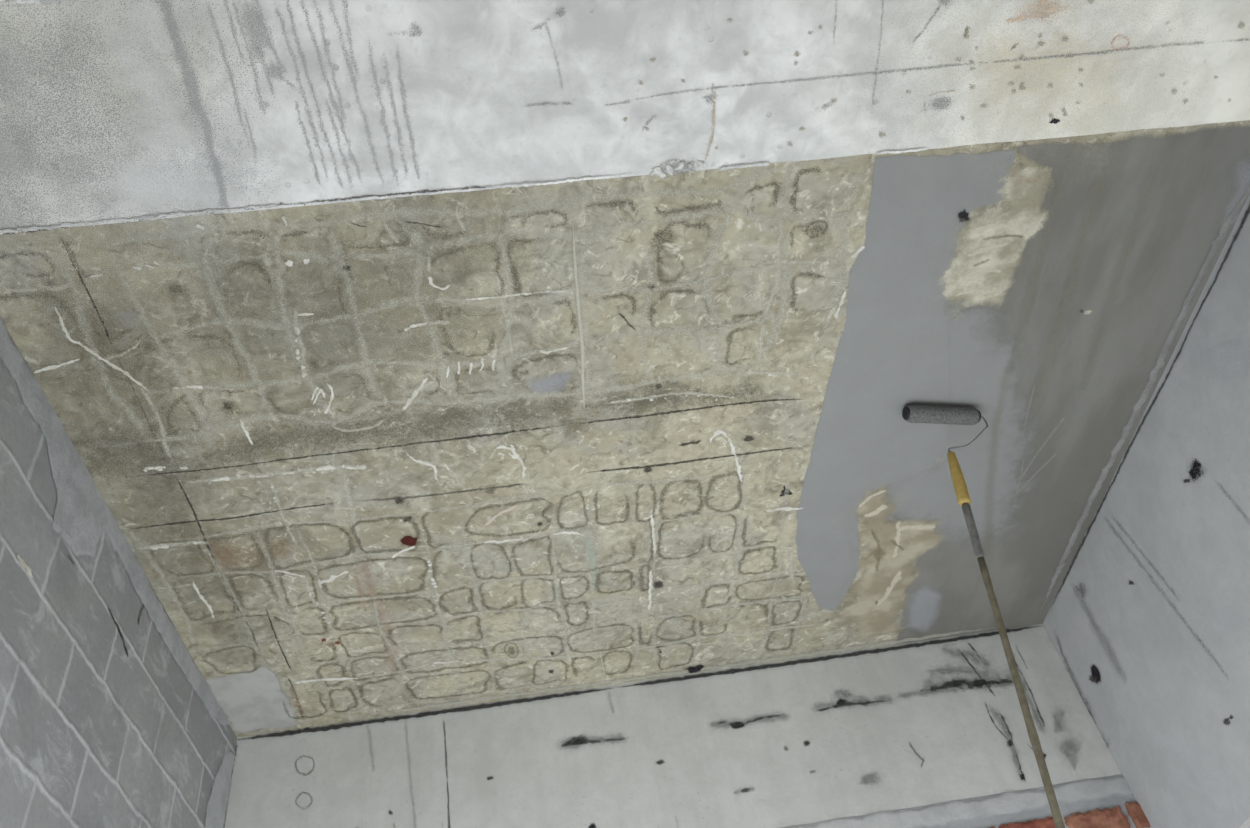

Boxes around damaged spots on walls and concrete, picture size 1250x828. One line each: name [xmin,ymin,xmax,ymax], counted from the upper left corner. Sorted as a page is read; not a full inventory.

spalling [877,132,928,155]
spalling [649,158,770,178]
peeling [311,174,629,205]
peeling [0,204,282,235]
peeling [937,160,1056,313]
peeling [835,486,947,643]